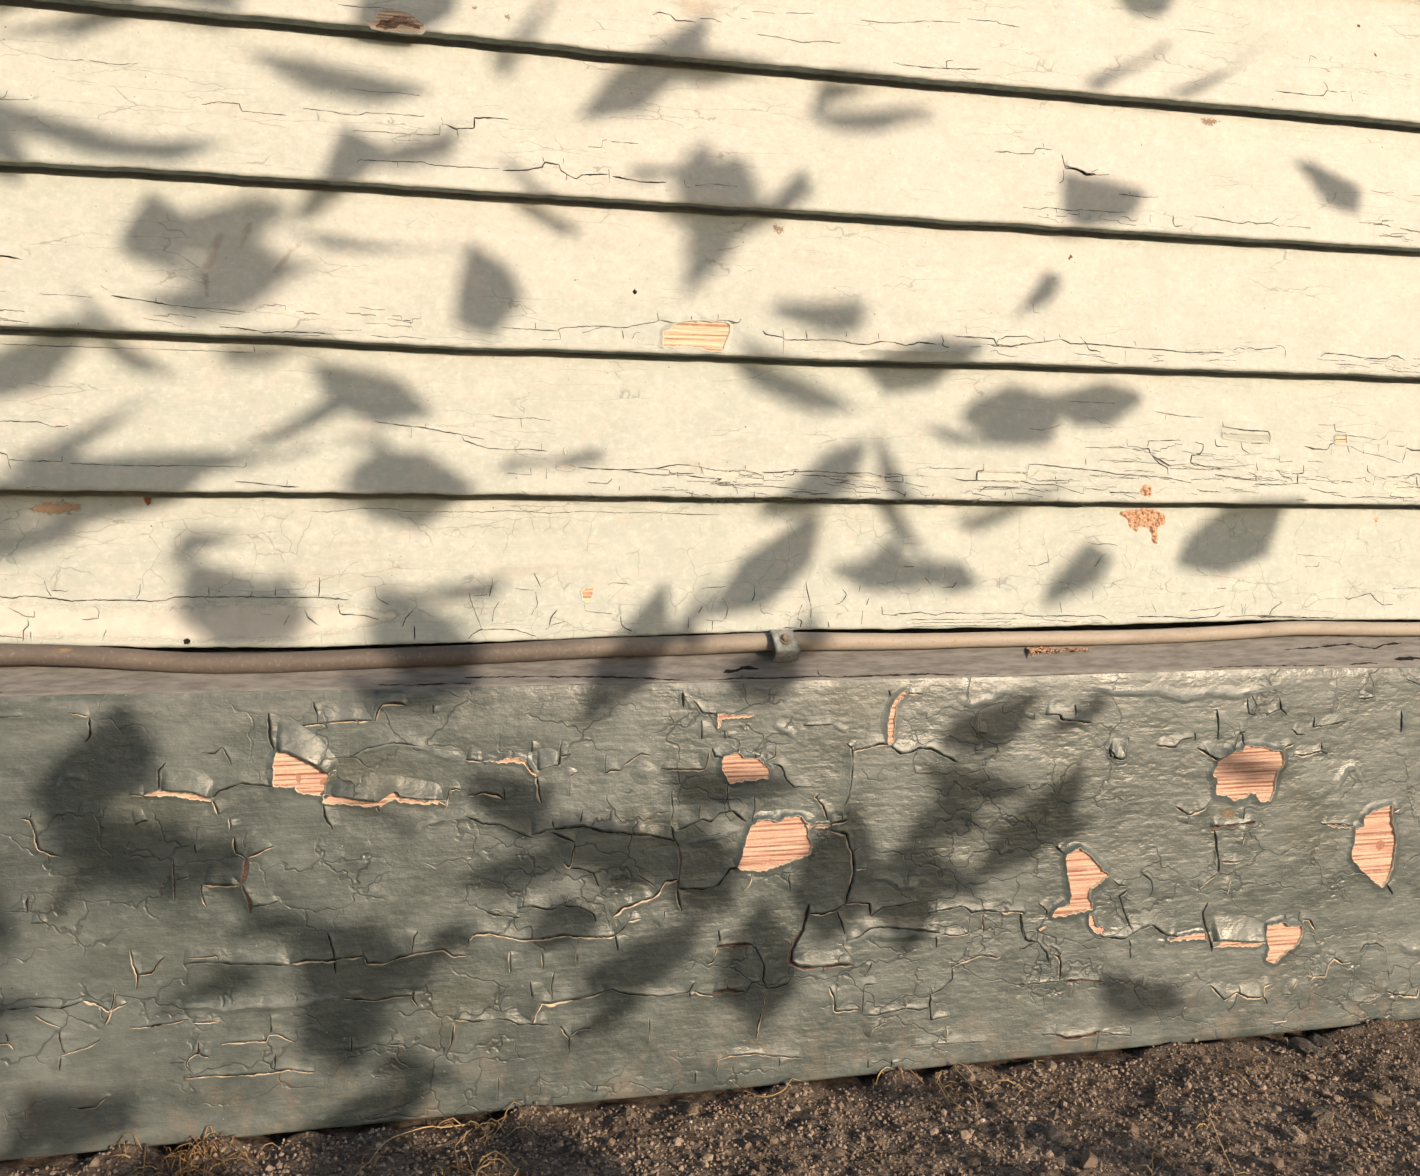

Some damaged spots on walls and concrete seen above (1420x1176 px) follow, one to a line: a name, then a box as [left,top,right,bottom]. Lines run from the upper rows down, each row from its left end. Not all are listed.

crack [202,87,738,188]
crack [0,286,425,354]
peeling [502,313,741,353]
crack [763,304,1420,373]
crack [0,415,720,516]
crack [302,670,1001,731]
peeling [128,713,461,829]
peeling [677,680,961,918]
peeling [1175,722,1294,824]
peeling [1321,798,1402,896]
crack [0,738,1133,1115]
peeling [1015,839,1318,968]